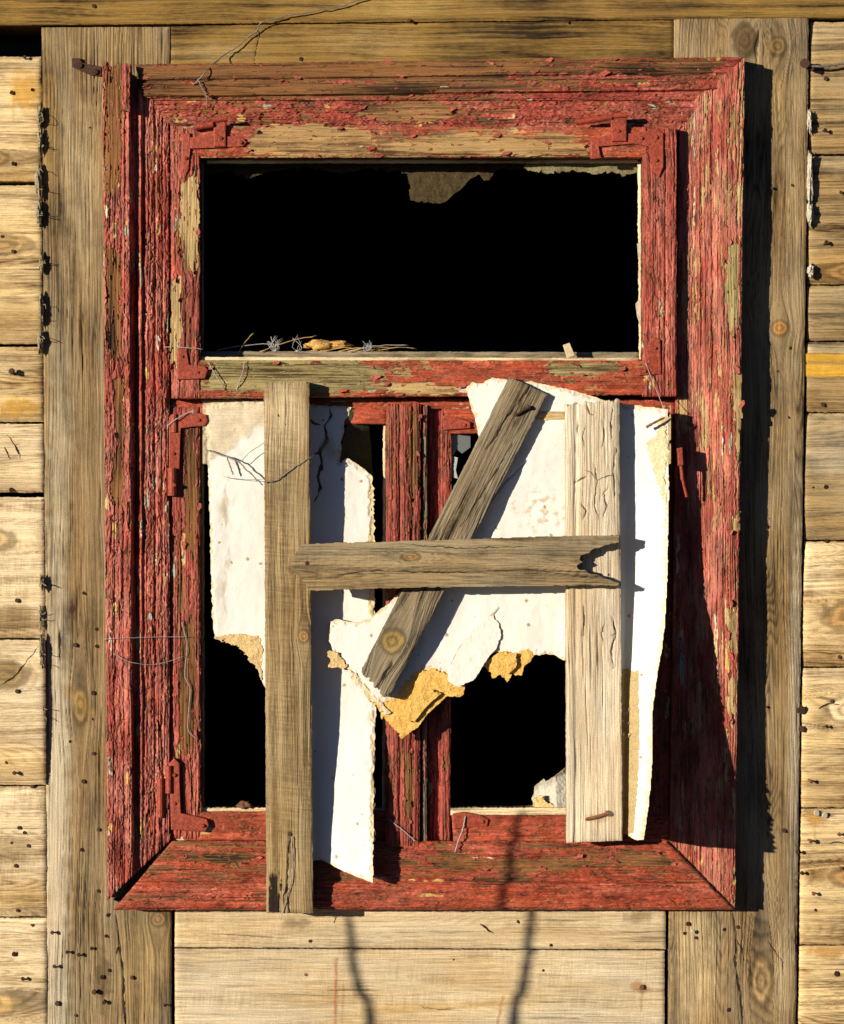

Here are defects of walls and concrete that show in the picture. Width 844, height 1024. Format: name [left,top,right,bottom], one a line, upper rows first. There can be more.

peeling [143,57,591,157]
peeling [169,169,200,372]
peeling [724,238,741,341]
peeling [103,242,125,515]
peeling [182,427,201,560]
crack [310,409,332,502]
peeling [207,361,466,396]
crack [318,387,578,579]
peeling [646,416,670,505]
peeling [731,365,745,457]
peeling [177,618,198,762]
peeling [726,599,737,726]